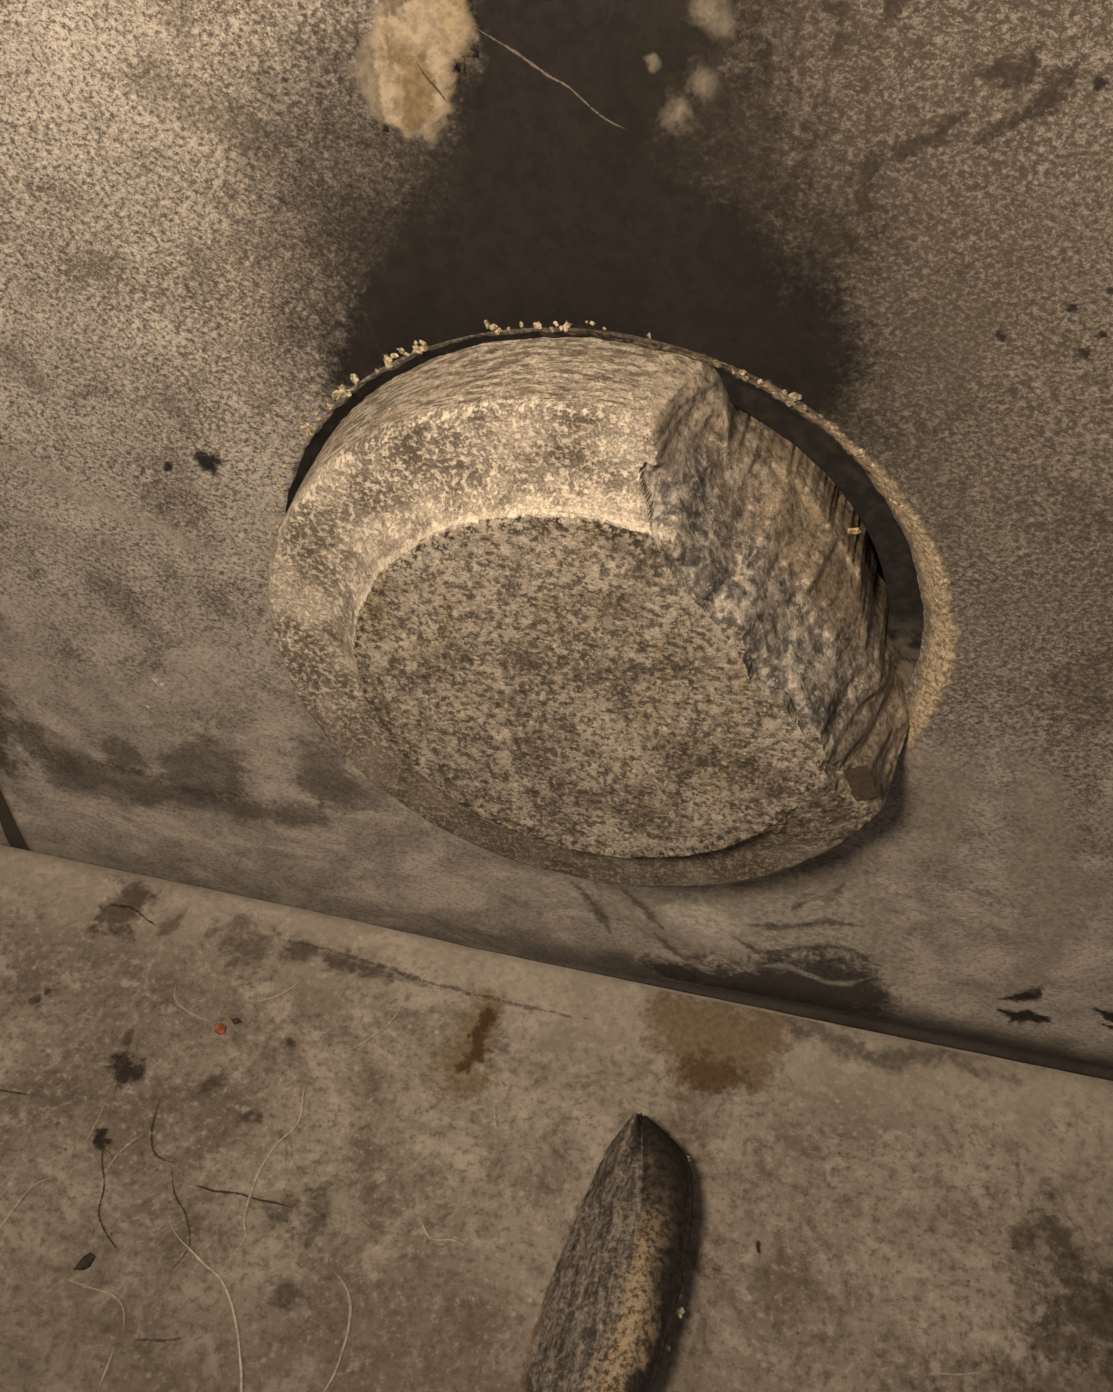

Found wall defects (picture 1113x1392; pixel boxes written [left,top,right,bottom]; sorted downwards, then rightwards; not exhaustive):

peeling [346,0,479,139]
water stain [980,47,1077,140]
water stain [281,0,842,411]
water stain [855,113,964,217]
water stain [640,951,896,1017]
corrosion [440,991,500,1092]
corrosion [646,992,783,1095]
crack [137,1335,180,1343]